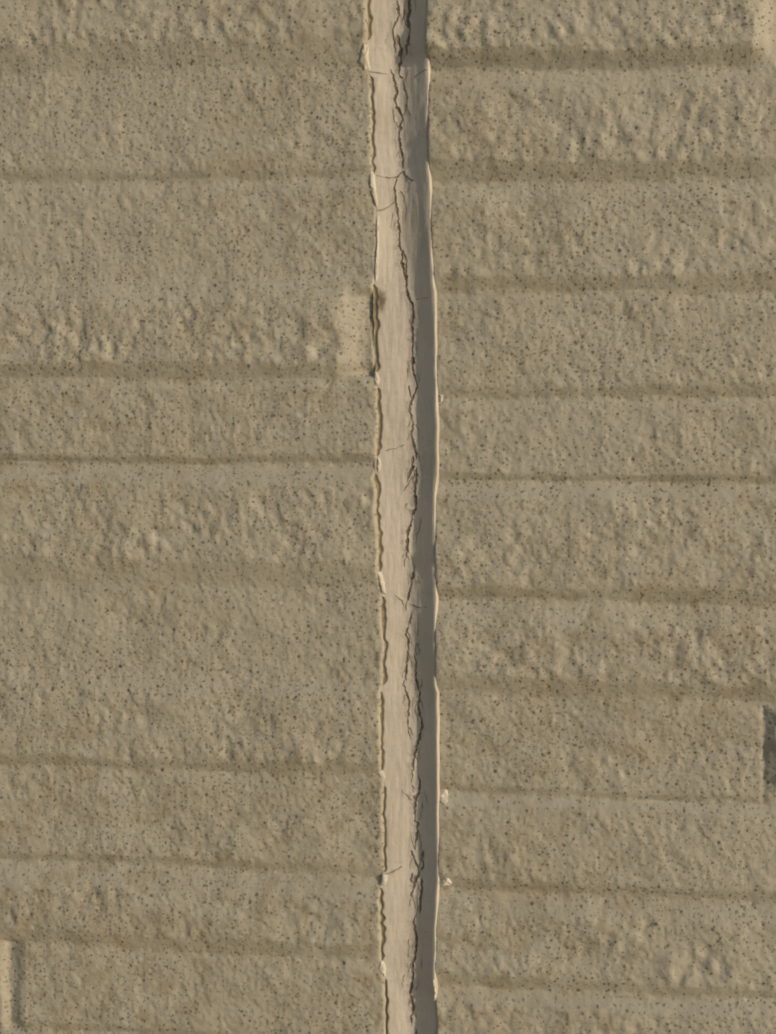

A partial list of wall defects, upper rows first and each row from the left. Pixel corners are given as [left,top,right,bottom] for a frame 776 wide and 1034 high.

crack [373,0,428,1034]